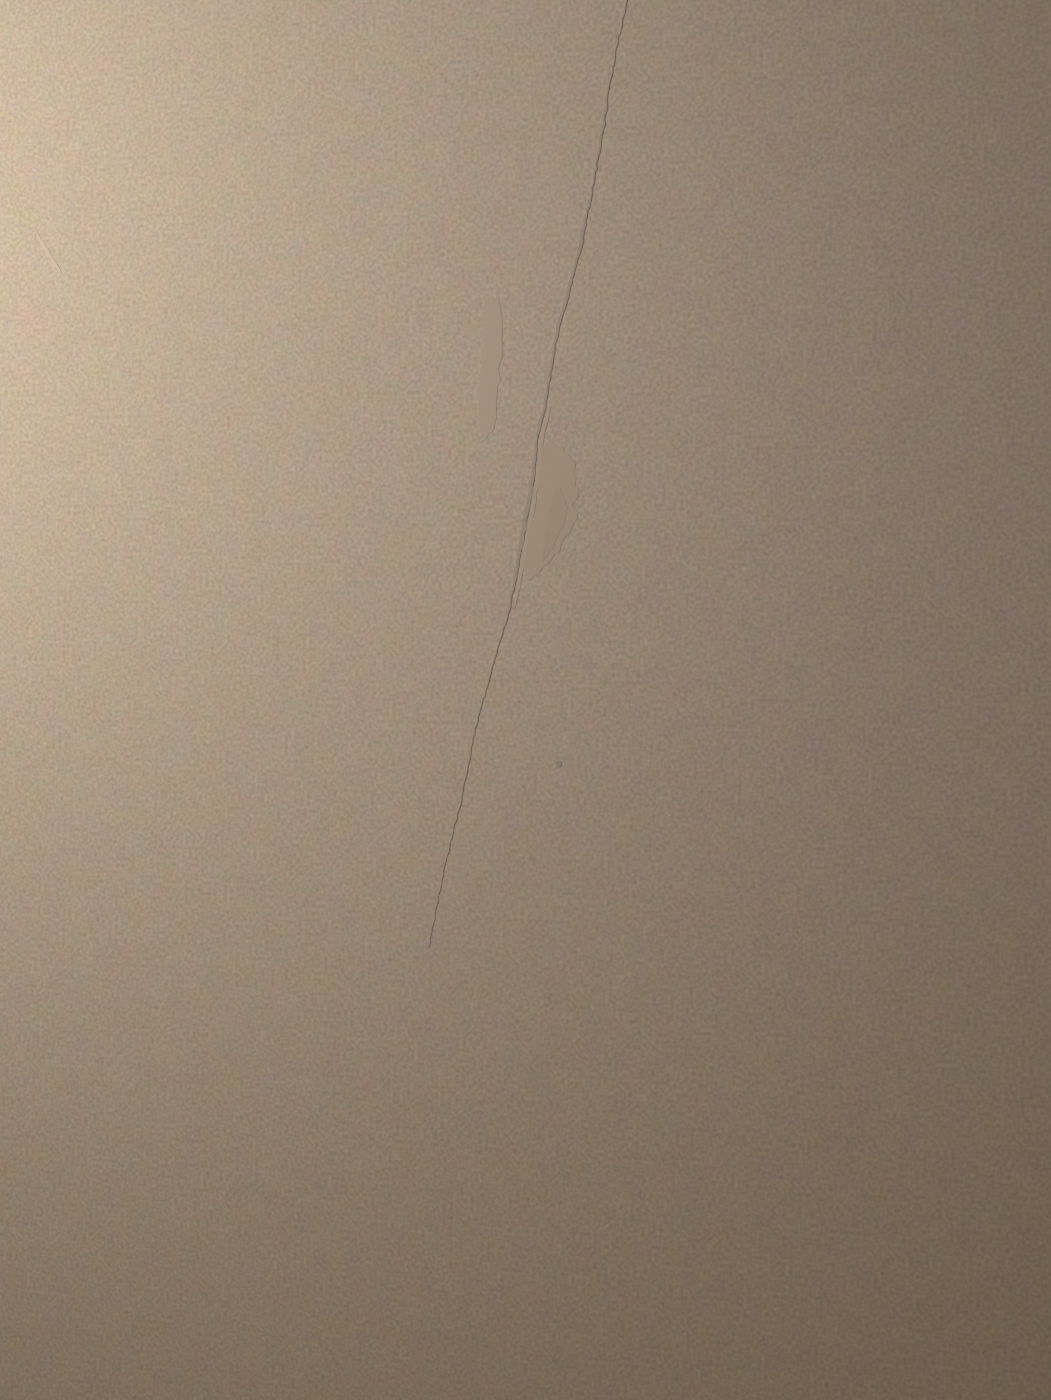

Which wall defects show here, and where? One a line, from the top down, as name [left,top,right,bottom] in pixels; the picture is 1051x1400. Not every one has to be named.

crack [429,0,627,946]